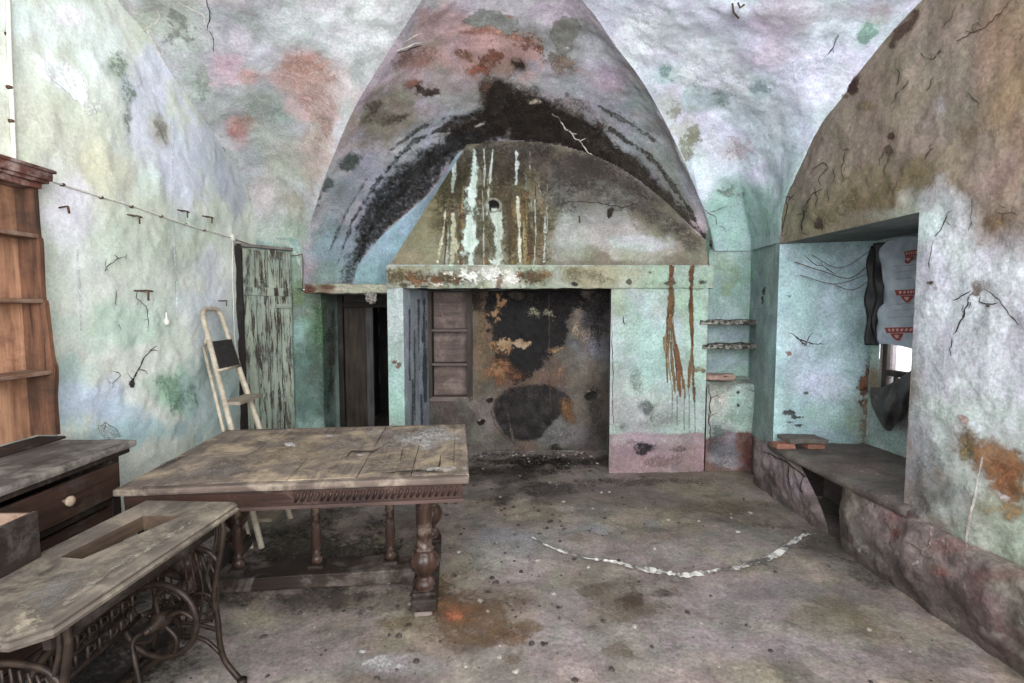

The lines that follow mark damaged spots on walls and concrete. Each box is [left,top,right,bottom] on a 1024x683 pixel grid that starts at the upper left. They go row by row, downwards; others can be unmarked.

water stain [316,177,334,206]
spalling [361,101,406,125]
corrosion [386,205,468,288]
spalling [415,85,440,97]
water stain [331,118,560,285]
crack [556,116,593,156]
water stain [585,105,713,249]
crack [781,142,852,273]
crack [105,255,157,389]
corrosion [663,265,705,402]
crack [949,289,1019,356]
corrosion [958,415,1024,520]